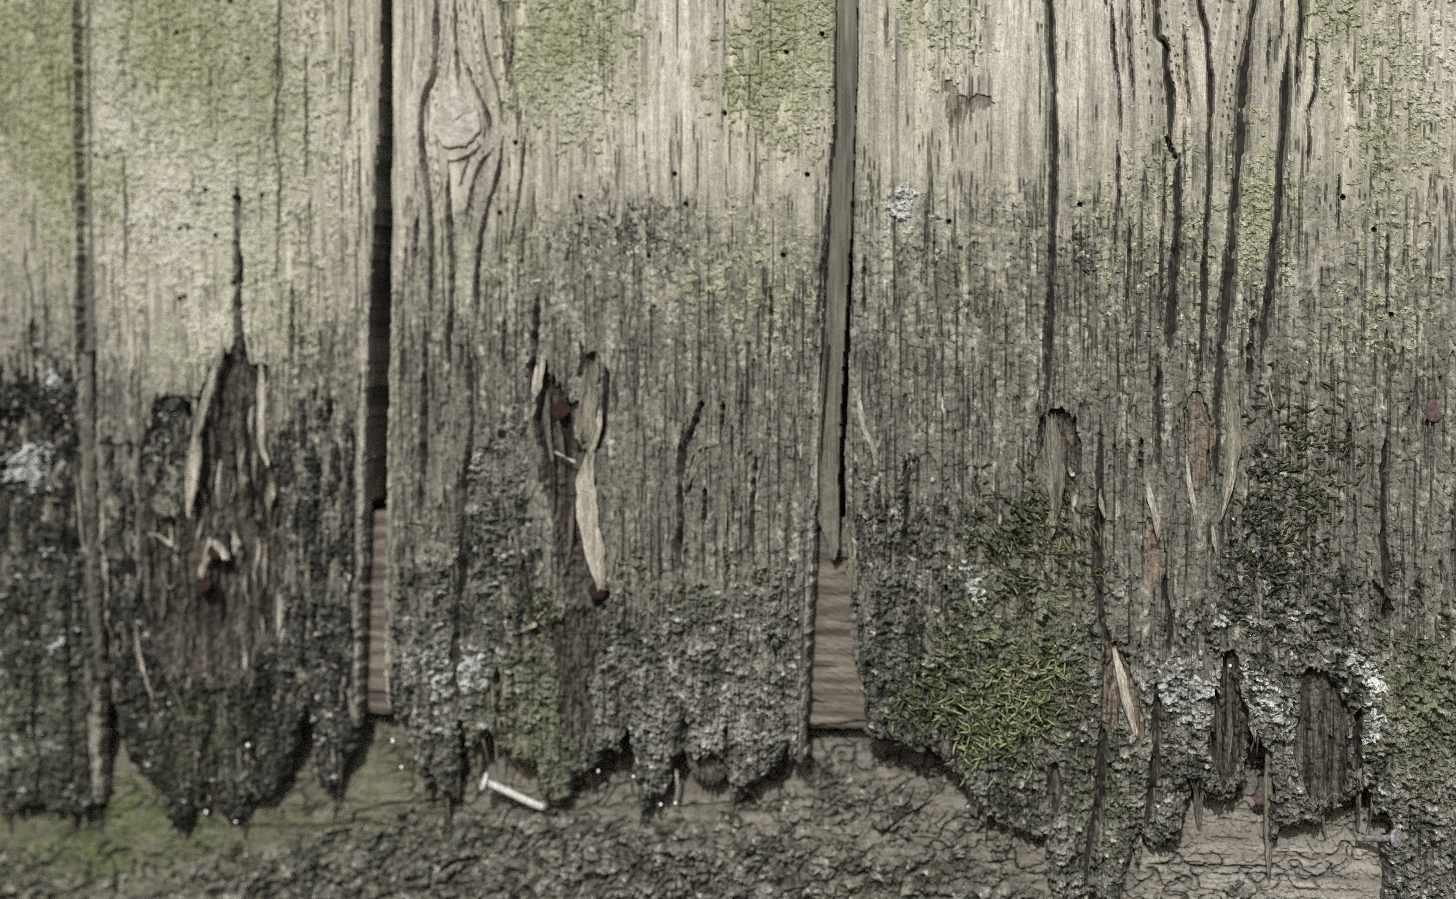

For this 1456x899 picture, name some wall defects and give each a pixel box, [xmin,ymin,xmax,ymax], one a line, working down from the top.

crack [236,192,245,352]
water stain [540,195,701,289]
crack [1105,0,1340,478]
water stain [281,316,340,396]
crack [1094,416,1113,660]
water stain [1399,489,1456,596]
crack [883,787,979,840]
crack [987,850,1042,869]
crack [1085,727,1106,877]